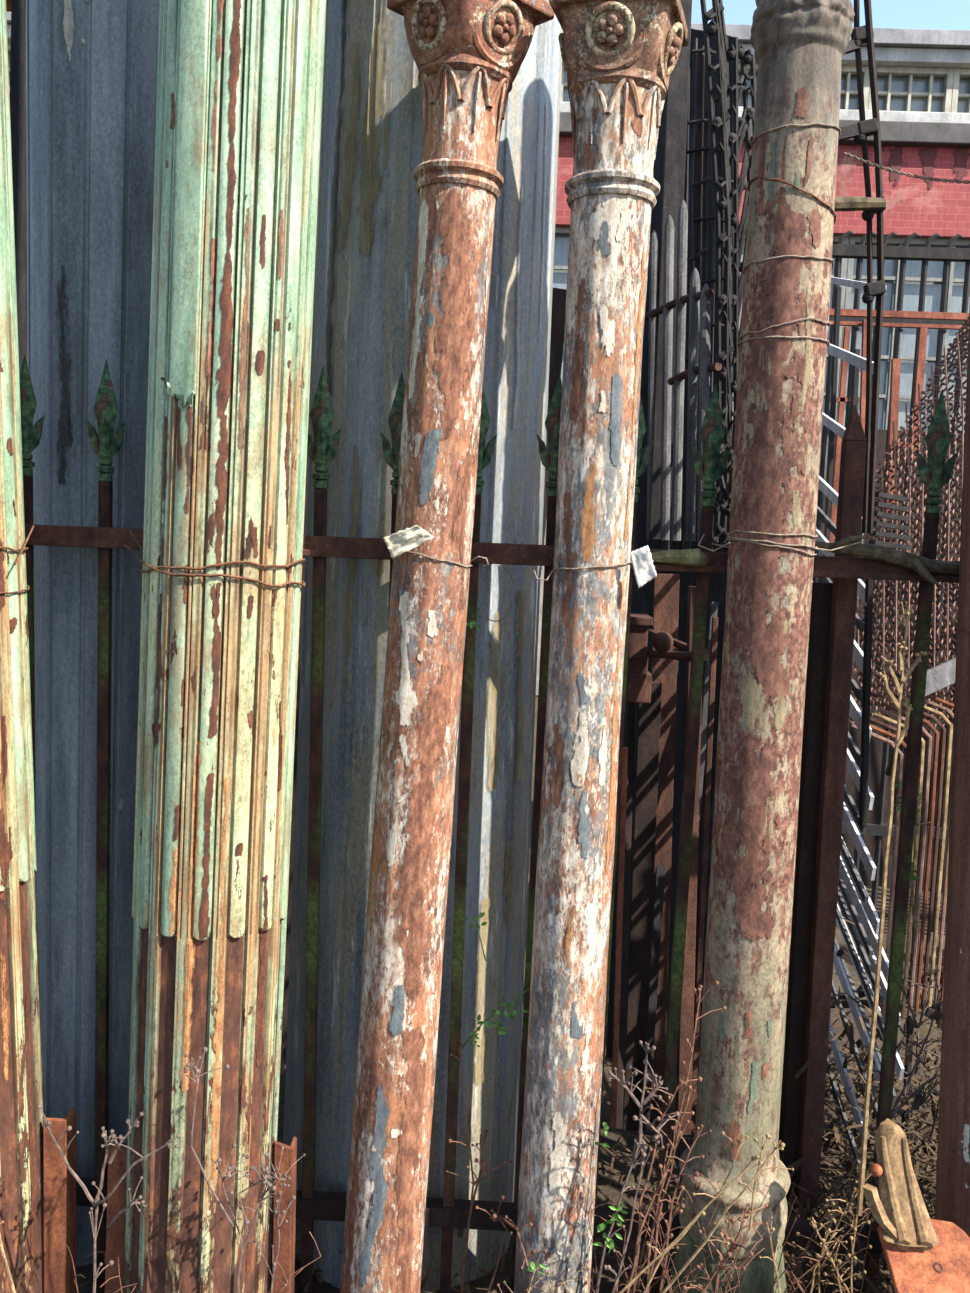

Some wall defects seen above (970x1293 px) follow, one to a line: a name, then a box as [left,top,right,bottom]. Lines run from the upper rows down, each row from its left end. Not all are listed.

rust [804,138,815,186]
rust [434,188,476,440]
peeling [589,268,616,356]
peeling [177,372,211,514]
peeling [599,374,622,466]
rust [453,451,472,610]
rust [393,662,453,1001]
peeling [571,673,607,860]
peeling [571,1001,592,1073]
rust [345,1111,360,1293]
rust [393,1027,426,1293]
peeling [549,1111,567,1194]